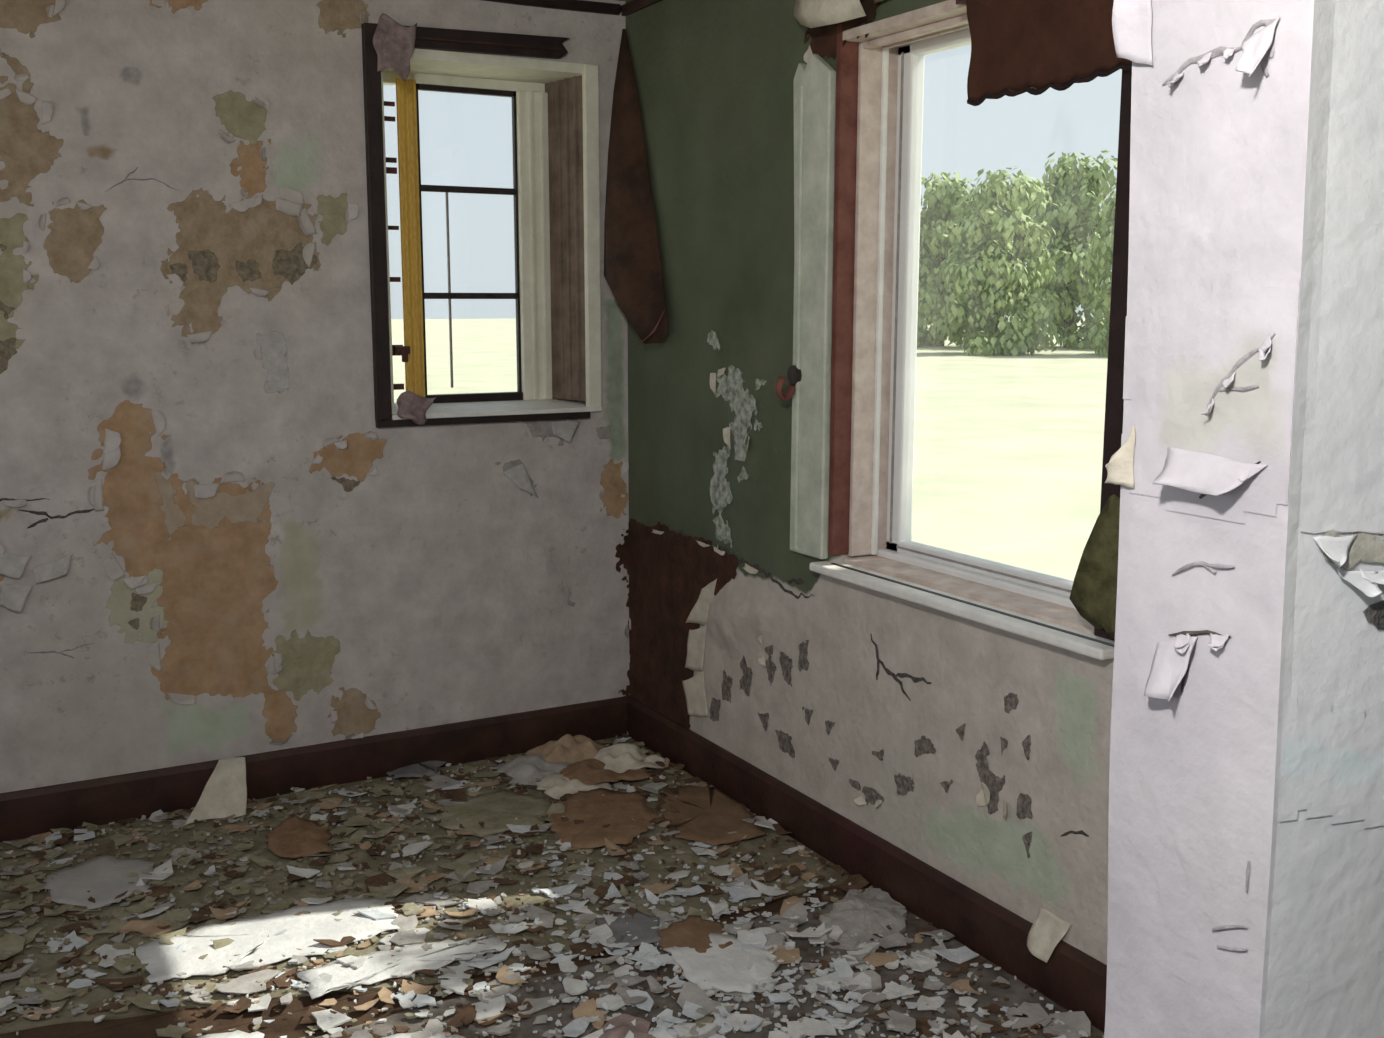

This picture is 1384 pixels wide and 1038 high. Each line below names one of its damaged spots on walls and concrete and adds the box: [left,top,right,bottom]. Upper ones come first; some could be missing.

peeling [0,0,65,38]
peeling [0,49,106,374]
peeling [160,90,359,343]
peeling [87,400,387,745]
peeling [597,365,766,729]
peeling [1314,530,1384,629]
flaking render [710,636,809,721]
crack [870,634,932,701]
flaking render [758,713,795,758]
flaking render [828,757,915,808]
flaking render [914,736,936,757]
flaking render [975,735,1033,858]